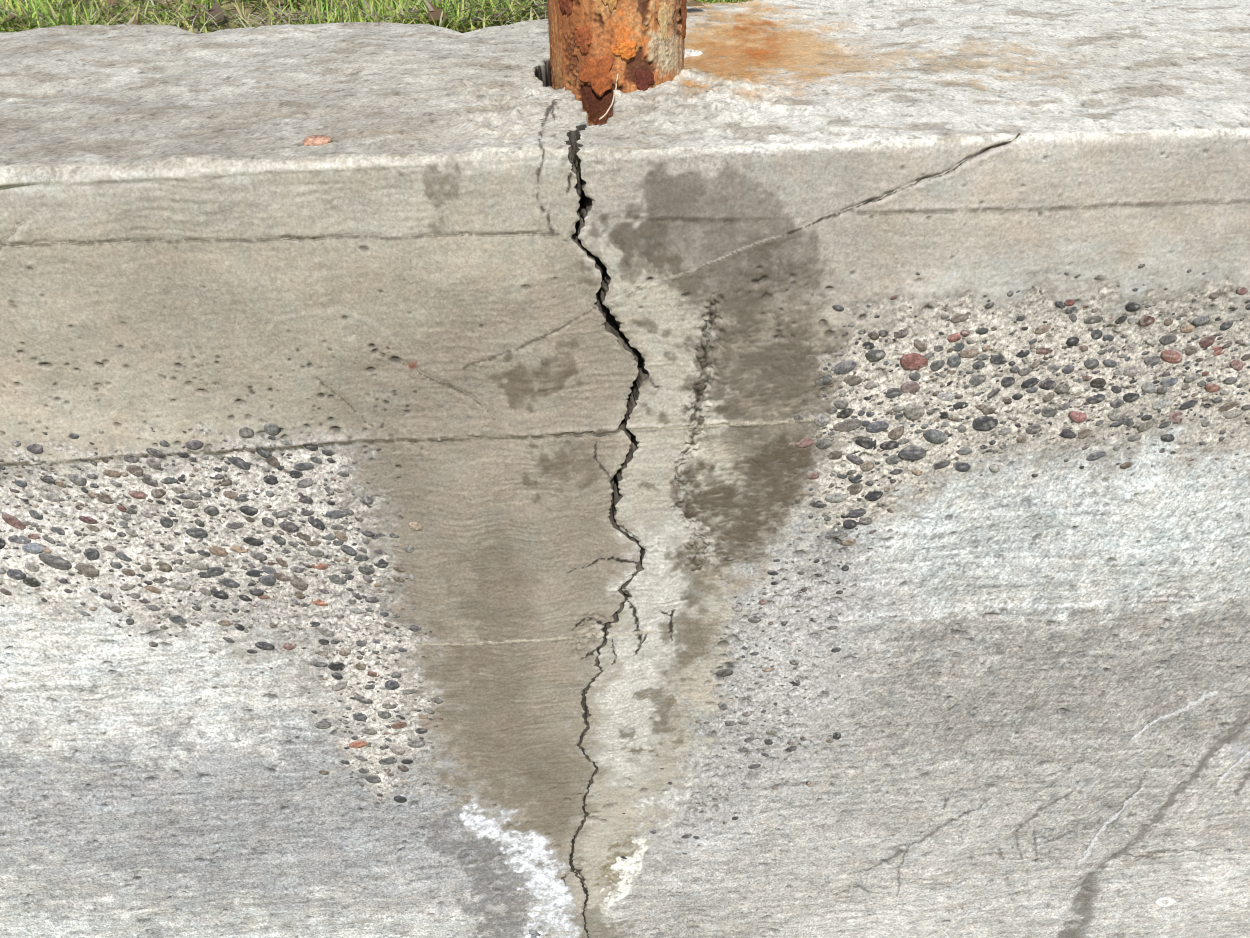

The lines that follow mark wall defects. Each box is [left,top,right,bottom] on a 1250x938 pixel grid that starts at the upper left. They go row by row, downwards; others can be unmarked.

rust [684,2,845,94]
leakage [489,353,576,408]
crack [536,98,675,938]
leakage [593,164,835,786]
leakage [427,747,708,938]